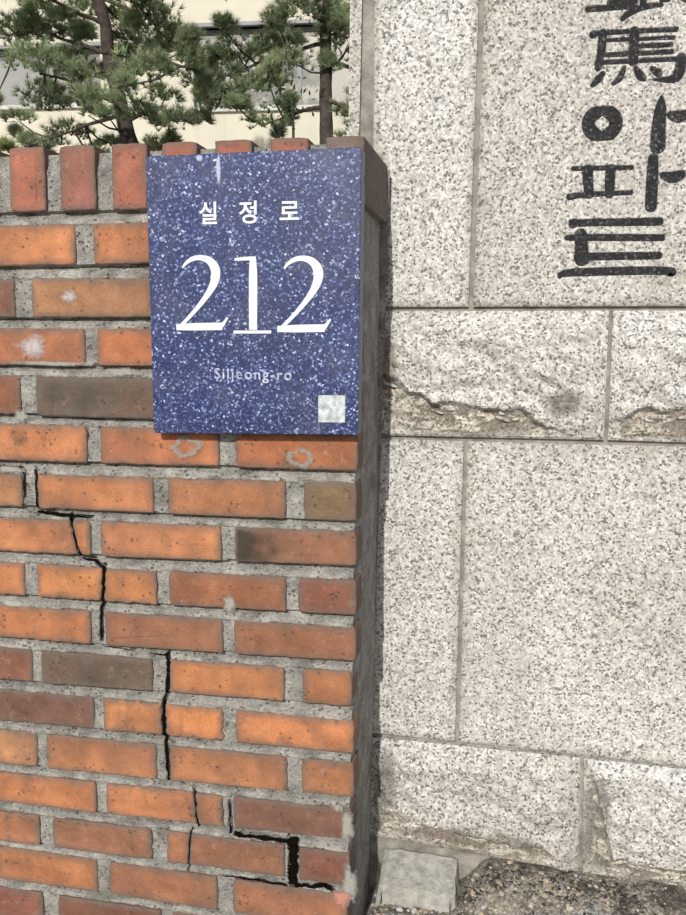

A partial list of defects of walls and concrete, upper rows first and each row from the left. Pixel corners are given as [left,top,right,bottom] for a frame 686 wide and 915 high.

crack [0,465,171,780]
crack [188,788,199,870]
crack [226,801,234,833]
crack [222,837,333,892]